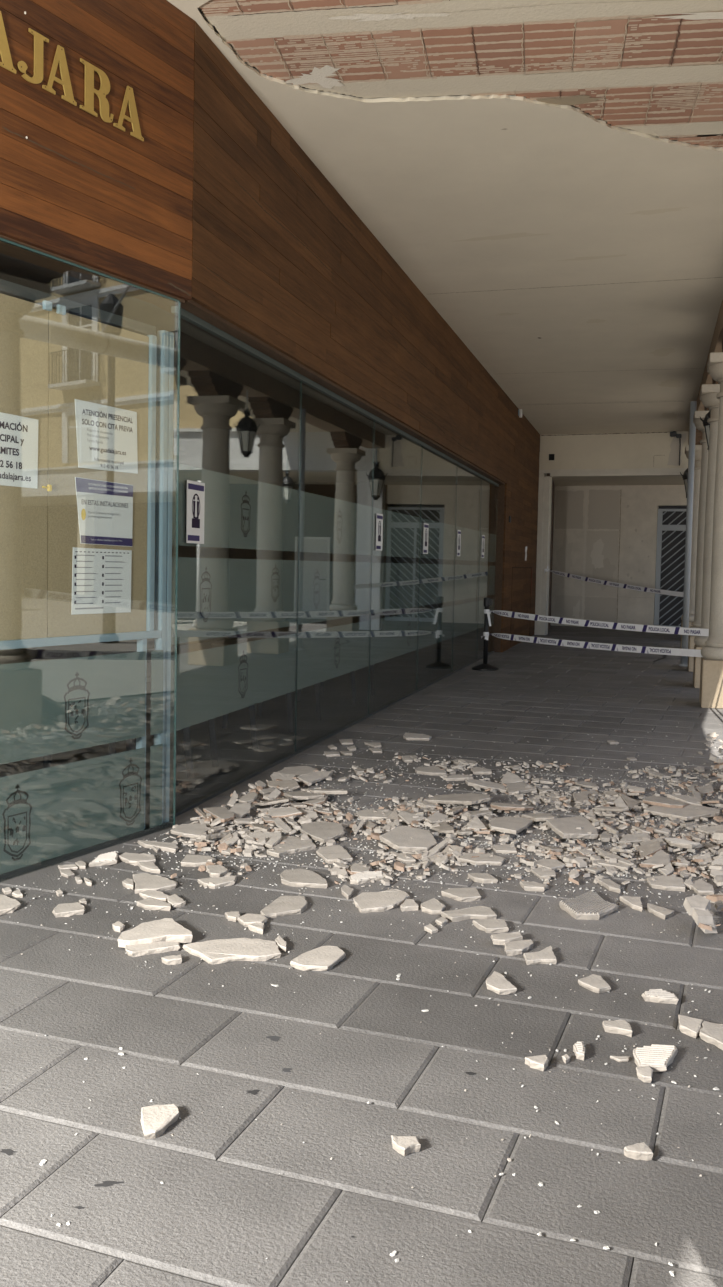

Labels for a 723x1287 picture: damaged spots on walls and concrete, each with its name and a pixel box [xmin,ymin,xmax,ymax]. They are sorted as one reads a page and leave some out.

spalling [197,0,723,151]